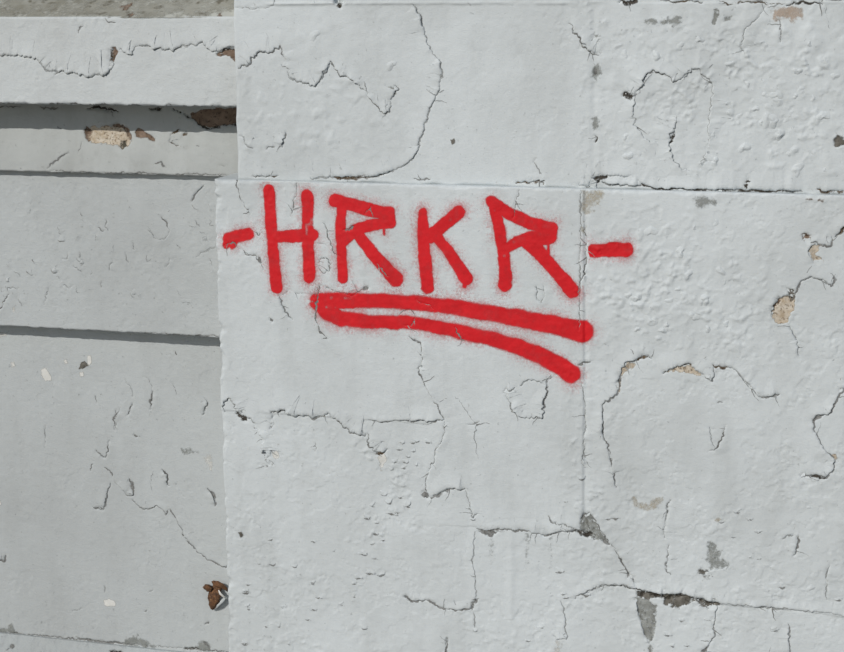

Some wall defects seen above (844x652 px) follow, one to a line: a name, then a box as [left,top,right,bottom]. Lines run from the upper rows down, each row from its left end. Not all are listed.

spalling [80,114,155,149]
spalling [166,108,286,150]
crack [288,4,446,212]
crack [575,194,596,327]
crack [783,213,844,297]
spalling [761,281,795,324]
crack [196,399,208,415]
crack [88,411,227,568]
crack [368,302,844,652]
spalling [580,515,606,540]
peeling [629,591,720,652]